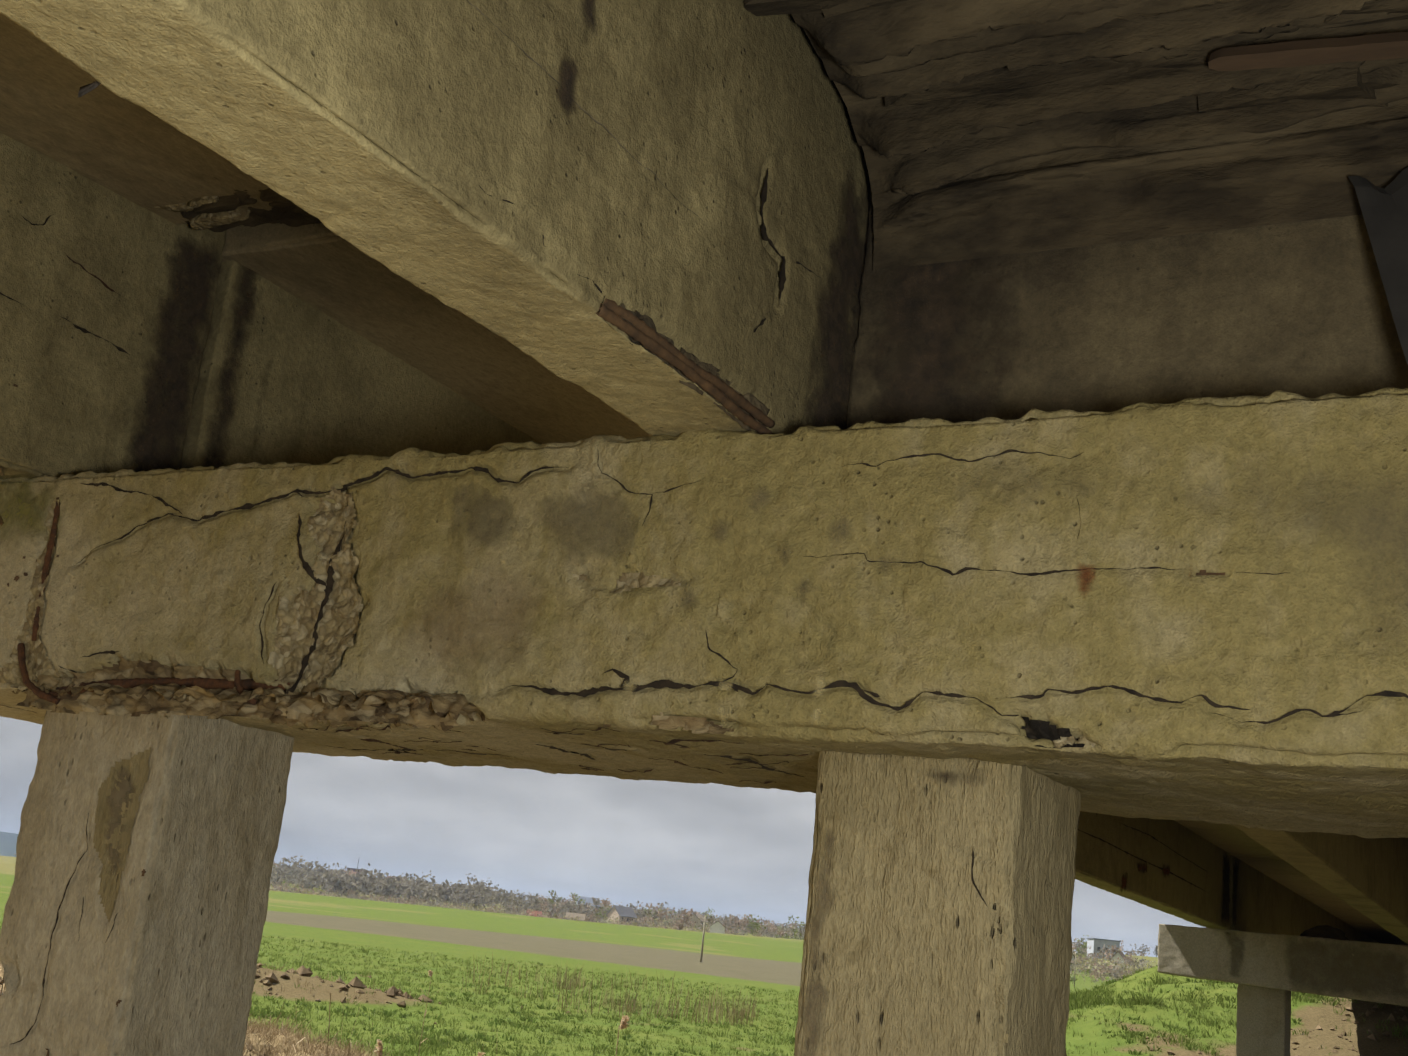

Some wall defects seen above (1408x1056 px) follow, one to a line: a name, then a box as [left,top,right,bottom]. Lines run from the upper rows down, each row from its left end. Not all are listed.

crack [754,169,821,332]
water stain [132,241,220,472]
water stain [206,268,255,466]
crack [58,650,119,673]
spalling [0,486,485,732]
crack [259,584,275,663]
crack [78,454,701,563]
crack [299,633,1408,784]
crack [842,449,1083,467]
crack [803,499,1178,576]
spalling [1021,717,1095,750]
crack [10,813,117,1045]